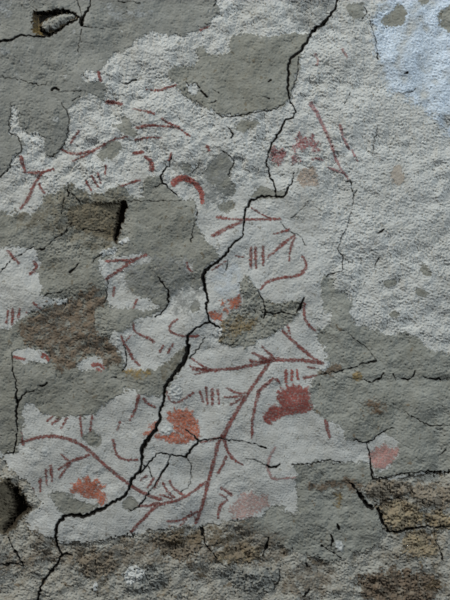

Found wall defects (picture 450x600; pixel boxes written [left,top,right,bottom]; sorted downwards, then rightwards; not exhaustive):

crack [0,0,102,51]
crack [22,80,81,157]
flaking render [0,0,220,178]
flaking render [168,32,309,133]
crack [0,182,105,273]
crack [36,0,342,600]
flaking render [0,174,450,600]
crack [321,338,443,383]
crack [353,427,450,480]
crack [346,479,447,560]